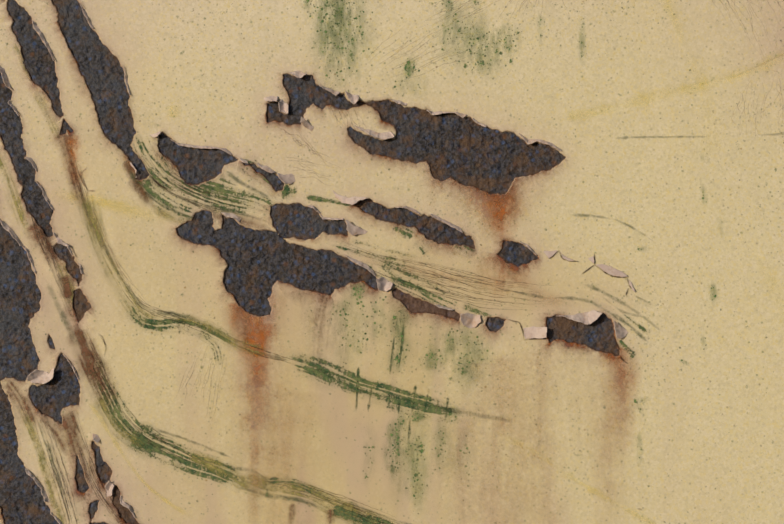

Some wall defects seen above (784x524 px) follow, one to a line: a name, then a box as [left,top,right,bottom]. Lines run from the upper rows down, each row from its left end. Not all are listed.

peeling [7,0,74,137]
peeling [0,67,91,325]
peeling [52,0,150,181]
peeling [150,131,295,191]
leakage [306,0,373,86]
peeling [176,203,505,332]
peeling [333,190,475,249]
peeling [263,70,565,196]
peeling [0,220,80,524]
rust [244,314,266,385]
leakage [292,355,457,469]
peeling [523,310,628,360]